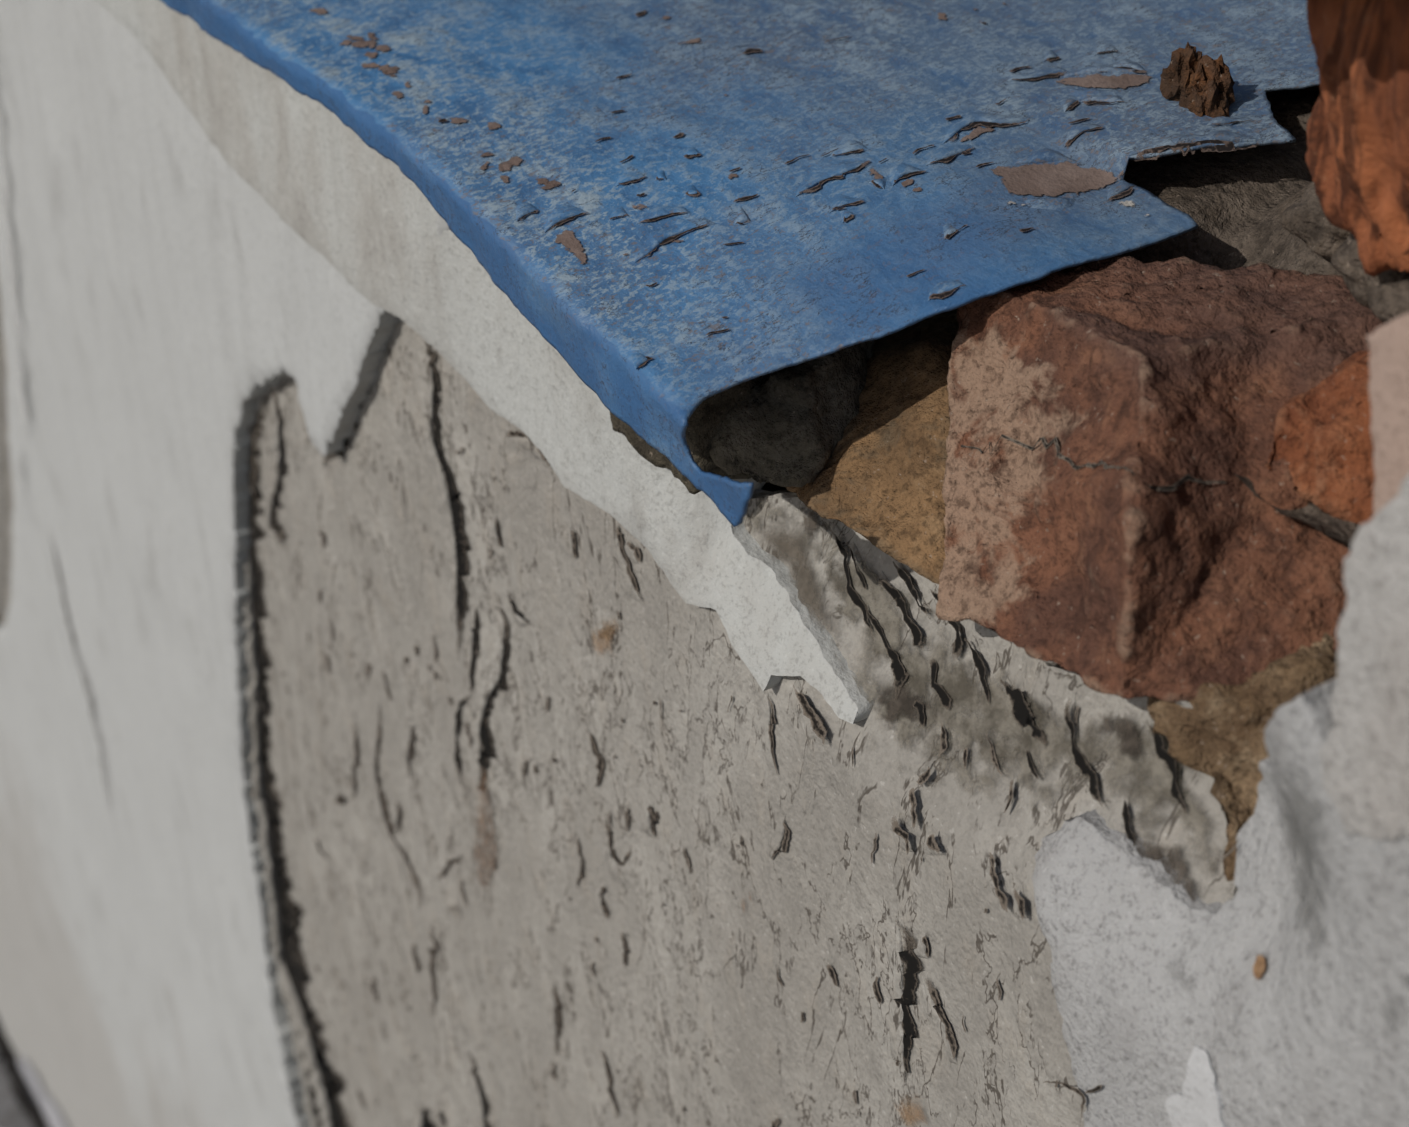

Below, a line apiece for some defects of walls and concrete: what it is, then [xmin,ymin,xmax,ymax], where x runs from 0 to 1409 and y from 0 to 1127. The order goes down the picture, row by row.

peeling [339,32,411,98]
peeling [1056,65,1151,100]
peeling [480,151,522,183]
peeling [990,148,1123,211]
peeling [555,230,588,269]
peeling [1366,313,1409,516]
crack [506,430,553,469]
crack [243,337,537,1127]
crack [822,520,1187,920]
crack [572,729,690,976]
crack [872,916,966,1086]
crack [1043,1080,1102,1118]